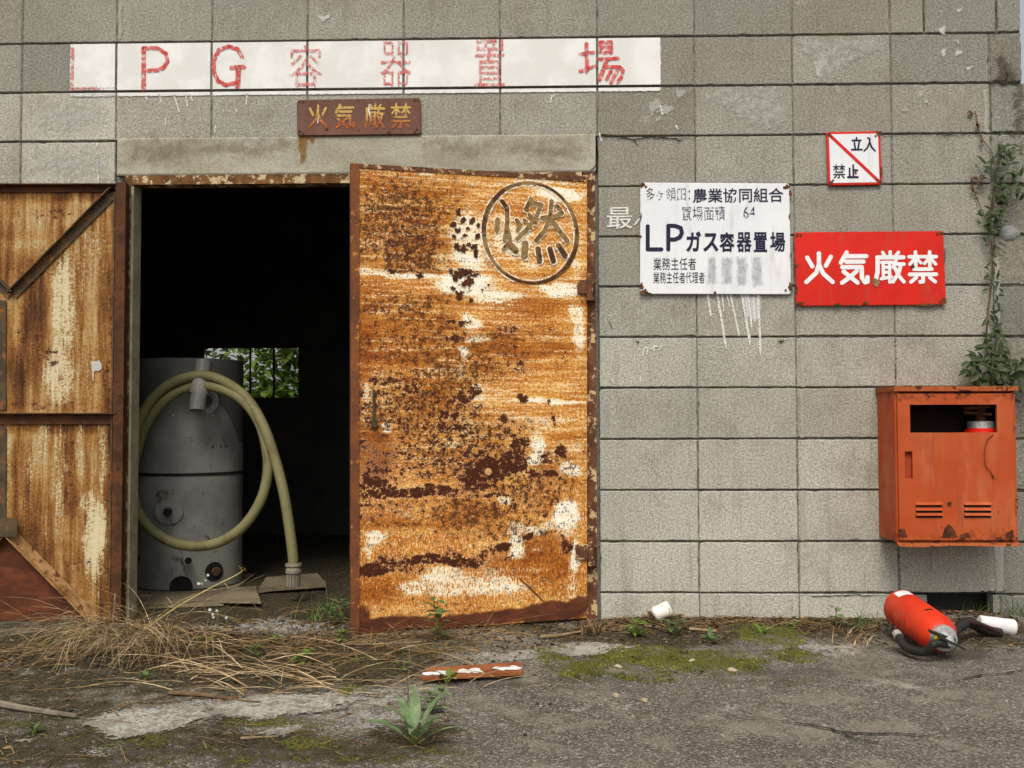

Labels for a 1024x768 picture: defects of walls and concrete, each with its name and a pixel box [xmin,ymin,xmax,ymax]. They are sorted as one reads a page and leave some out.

corrosion [298,136,315,162]
water stain [707,294,761,356]